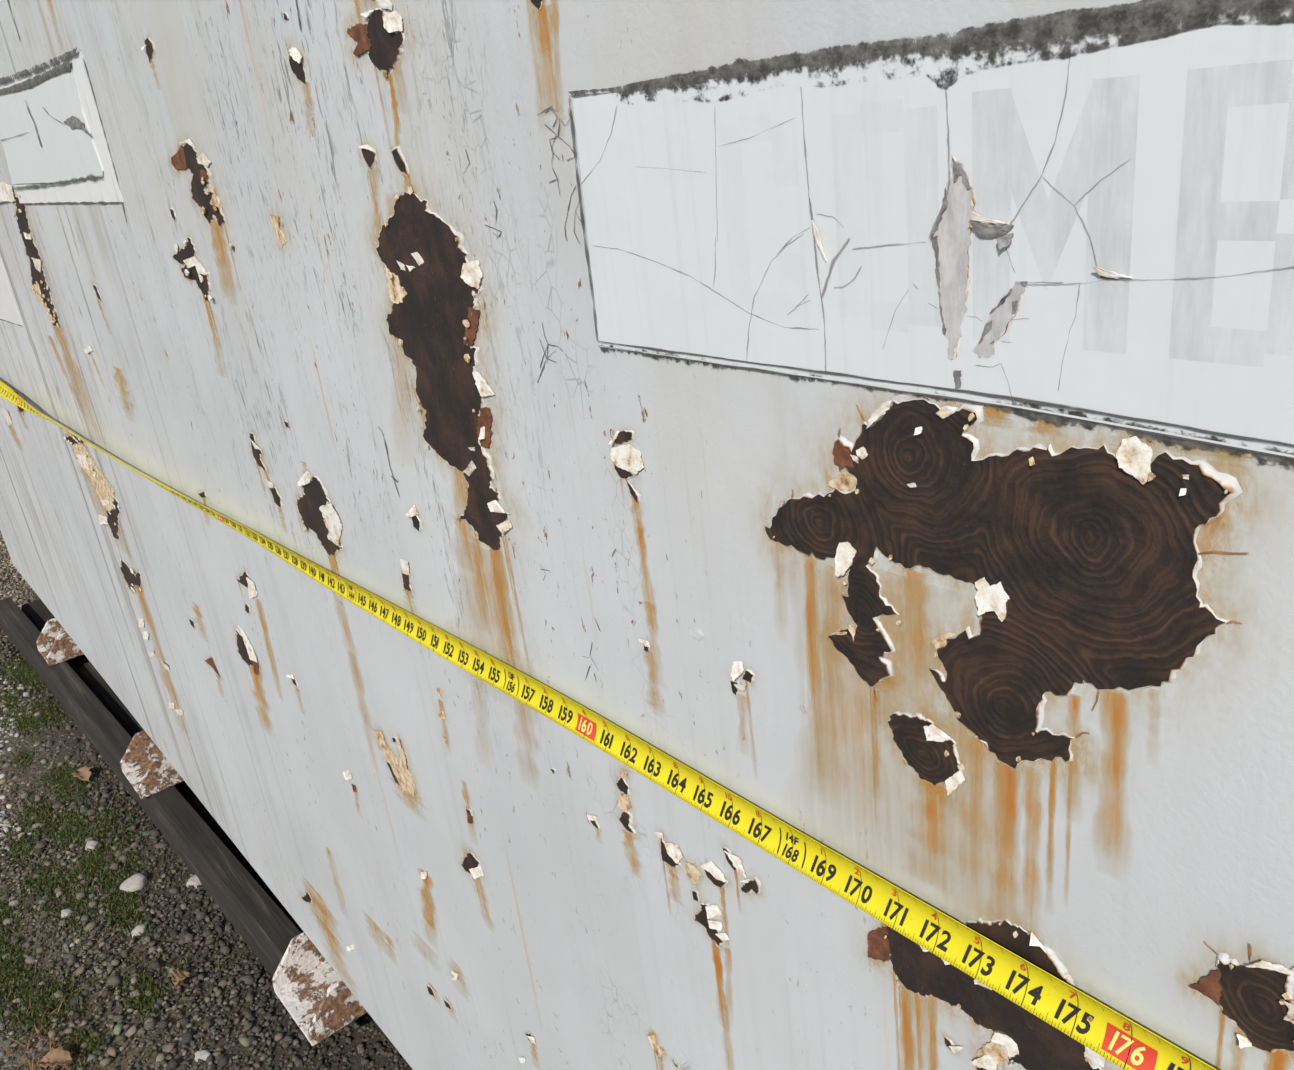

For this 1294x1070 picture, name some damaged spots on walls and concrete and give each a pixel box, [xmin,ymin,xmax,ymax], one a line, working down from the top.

corrosion [608,430,647,582]
corrosion [639,603,654,680]
corrosion [765,398,1248,897]
corrosion [617,770,638,868]
corrosion [655,832,762,1014]